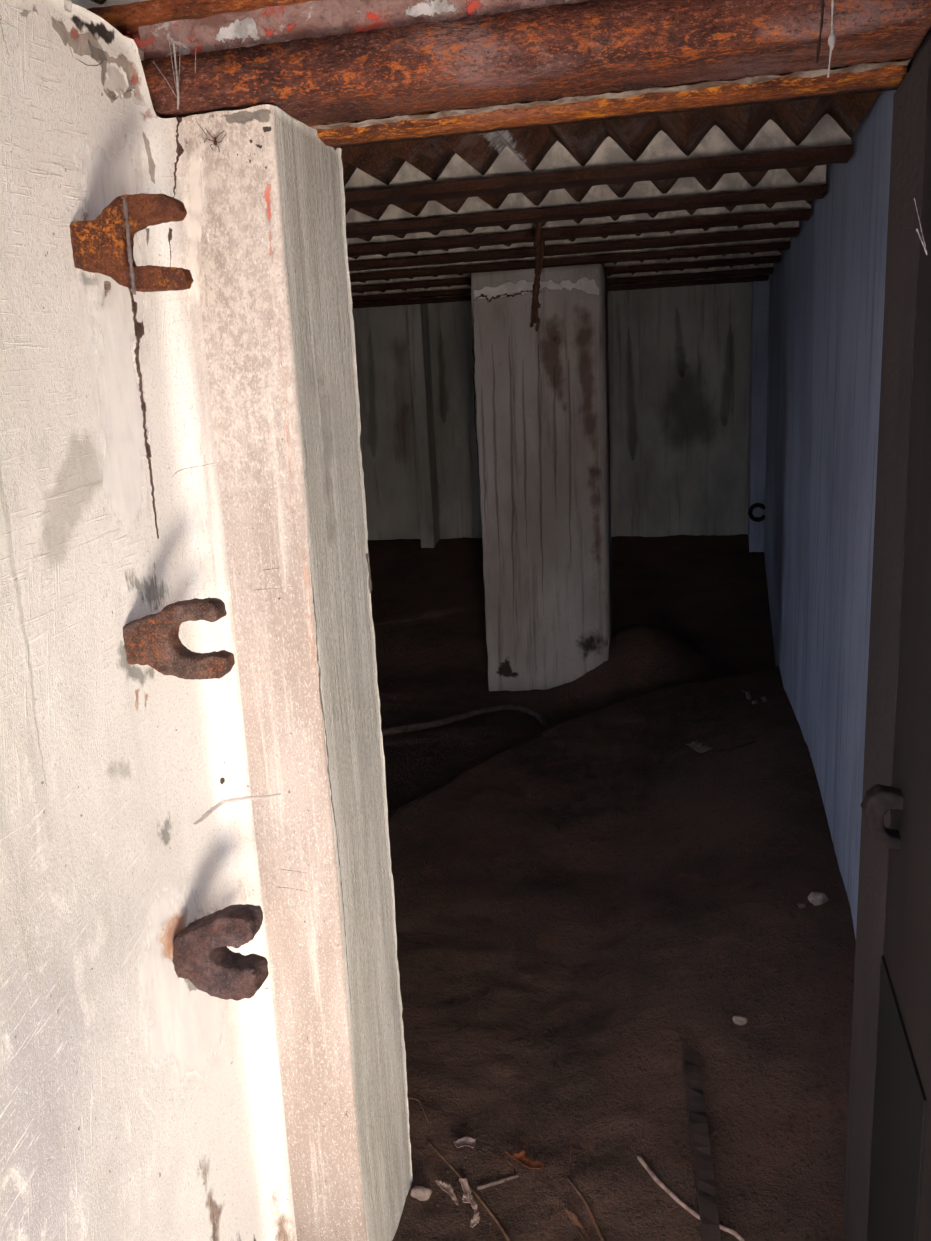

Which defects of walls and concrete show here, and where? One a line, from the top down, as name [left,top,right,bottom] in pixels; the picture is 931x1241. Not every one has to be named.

peeling [52,0,155,183]
crack [128,288,159,539]
corrosion [160,911,196,960]